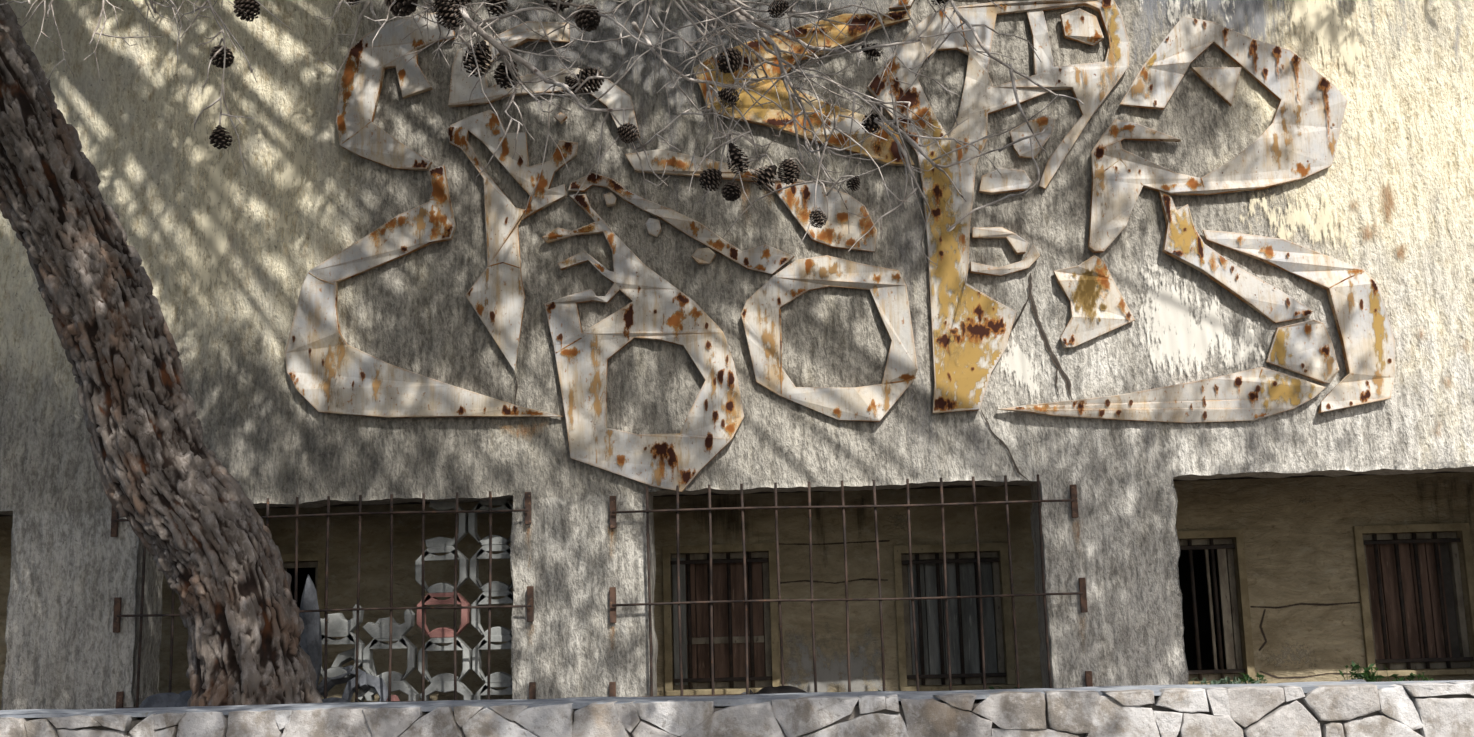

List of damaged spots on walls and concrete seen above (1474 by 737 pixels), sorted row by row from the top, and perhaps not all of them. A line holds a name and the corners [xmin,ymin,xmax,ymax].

water stain [1135,0,1284,59]
corrosion [690,0,1006,417]
corrosion [1063,258,1132,346]
crack [1250,602,1360,679]